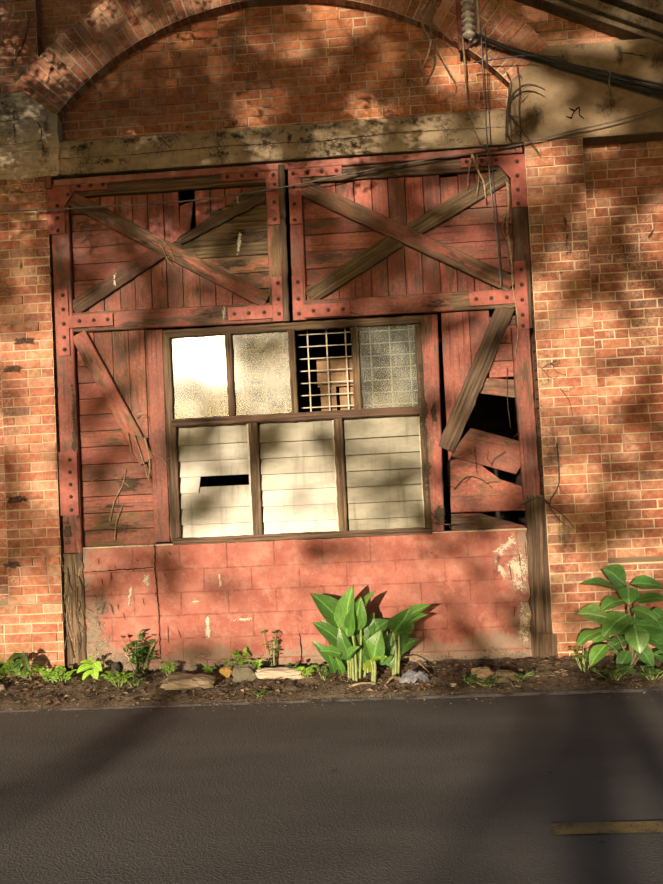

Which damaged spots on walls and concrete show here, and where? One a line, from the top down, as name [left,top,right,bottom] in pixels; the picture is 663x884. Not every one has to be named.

damp [206,120,278,157]
peeling [478,534,531,659]
peeling [401,654,466,662]